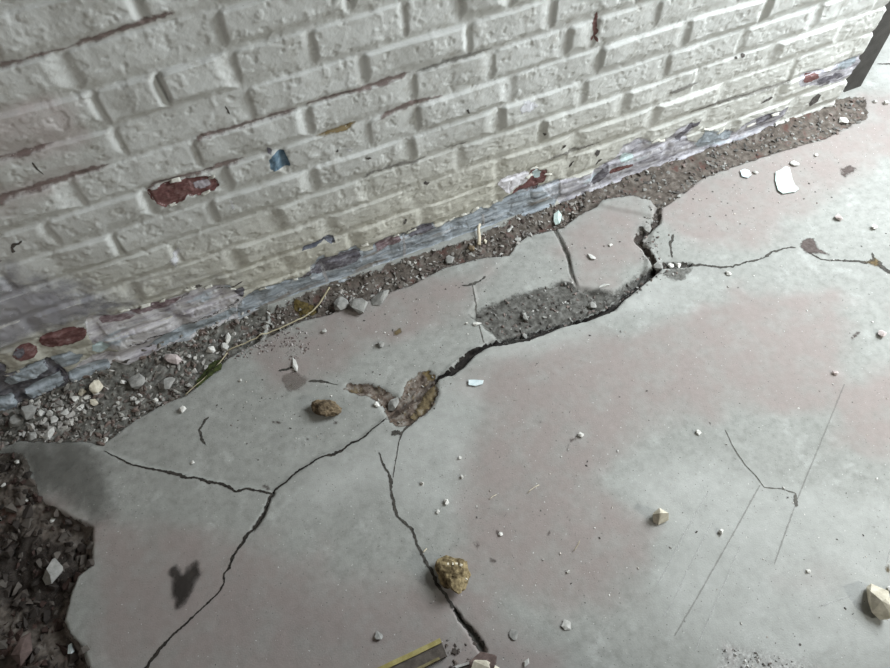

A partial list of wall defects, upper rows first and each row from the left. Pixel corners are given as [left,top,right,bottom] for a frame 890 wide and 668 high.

peeling [799,54,861,106]
peeling [775,166,799,194]
peeling [0,107,789,411]
crack [182,282,241,324]
crack [434,213,890,384]
spalling [343,370,439,427]
crack [725,430,798,507]
crack [105,417,485,668]